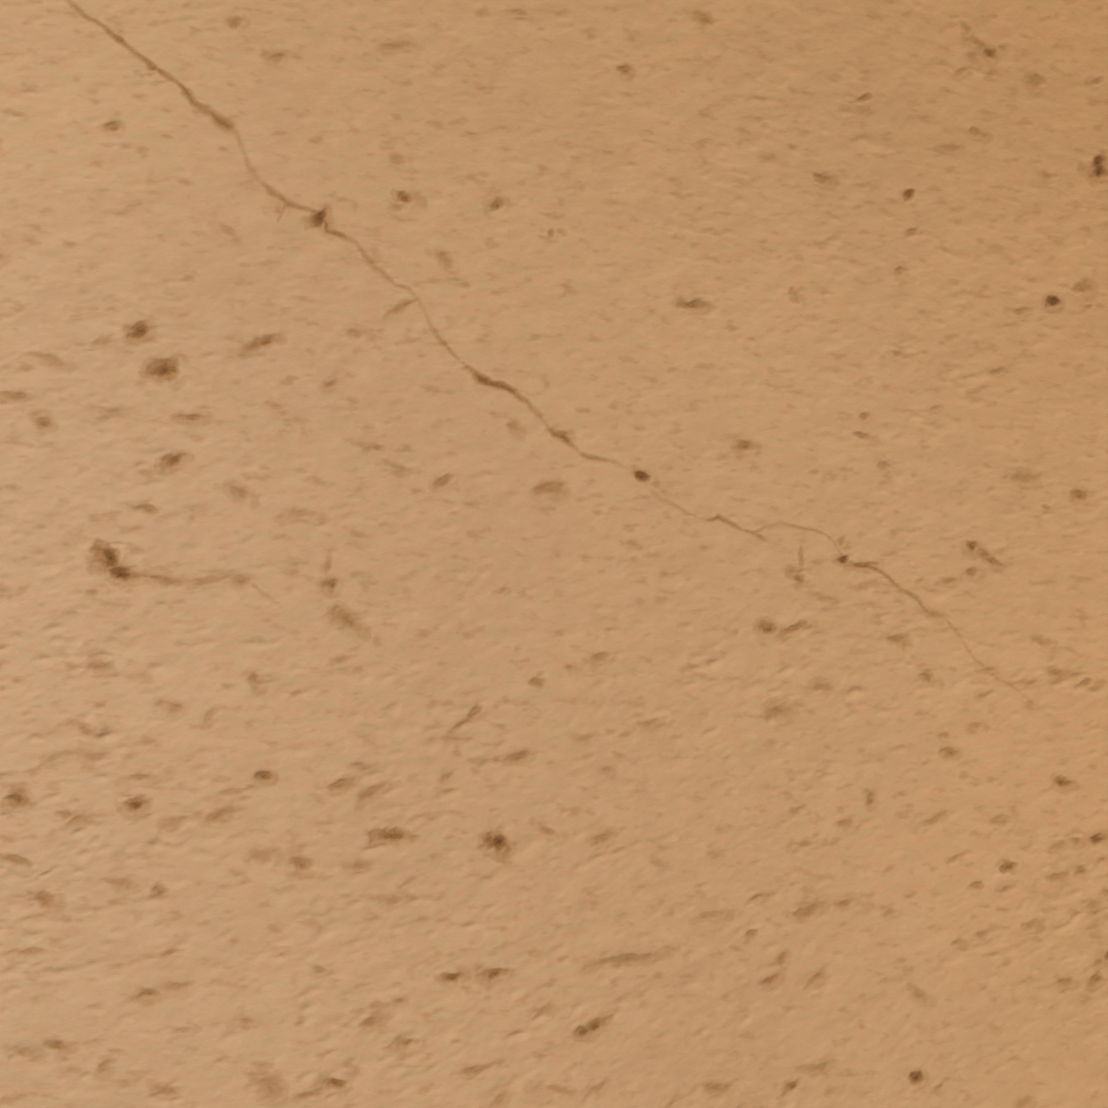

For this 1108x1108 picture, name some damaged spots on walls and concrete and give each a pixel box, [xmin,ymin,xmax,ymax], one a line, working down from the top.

crack [57,0,1070,731]